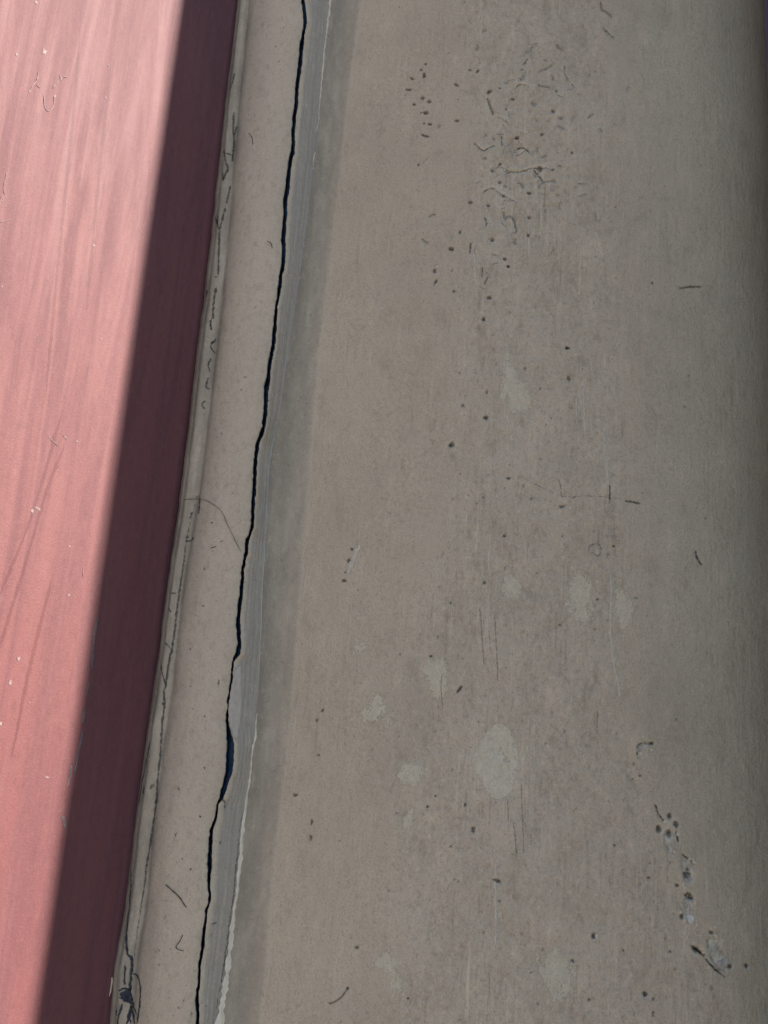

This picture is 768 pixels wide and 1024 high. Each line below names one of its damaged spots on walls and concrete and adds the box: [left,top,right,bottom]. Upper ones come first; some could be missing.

crack [195,0,307,1024]